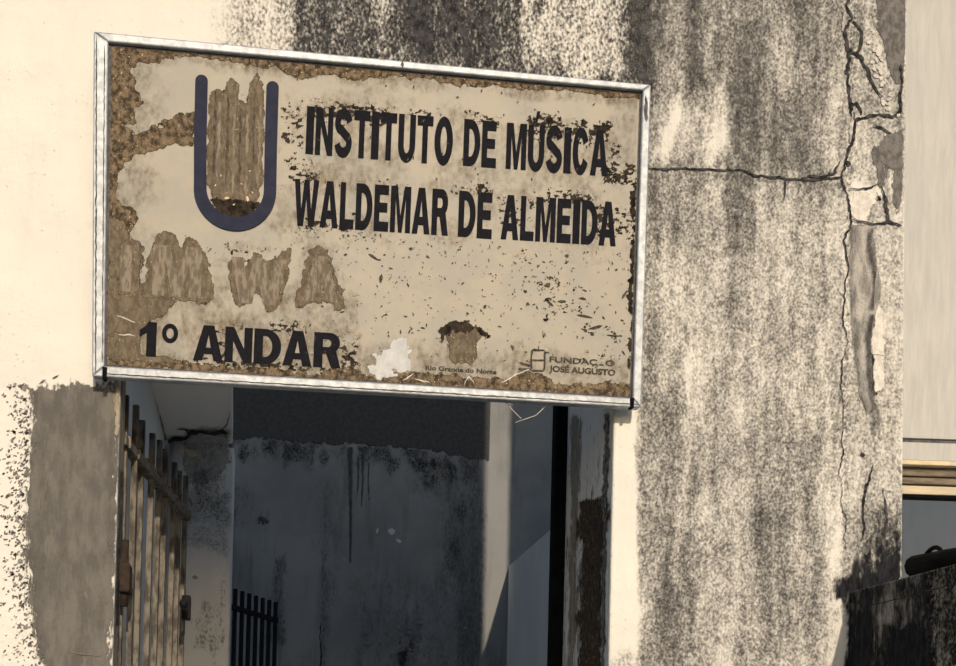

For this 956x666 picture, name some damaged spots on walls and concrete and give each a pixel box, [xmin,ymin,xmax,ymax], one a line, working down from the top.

spalling [864,0,906,117]
spalling [850,129,904,221]
leakage [235,0,956,666]
crack [648,0,903,549]
peeling [871,305,886,392]
spalling [0,375,59,666]
flaking render [573,496,610,666]